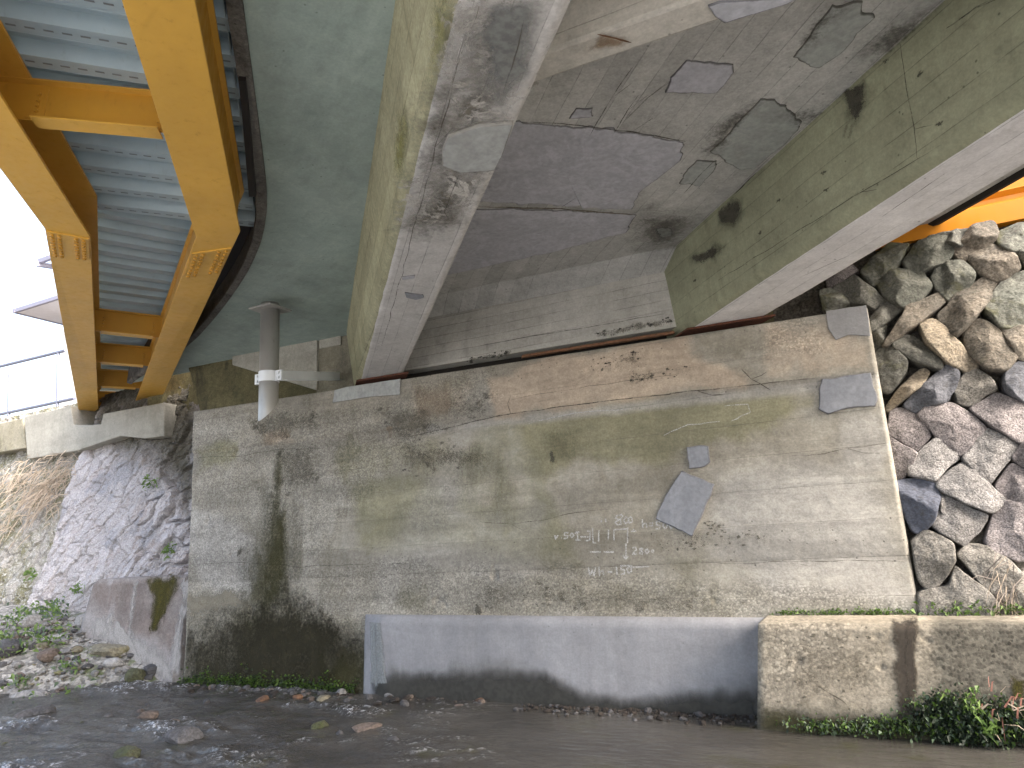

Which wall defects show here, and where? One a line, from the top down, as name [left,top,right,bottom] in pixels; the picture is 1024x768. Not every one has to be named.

crack [495,201,630,215]
spalling [596,317,672,337]
water stain [92,462,758,716]
water stain [892,617,918,725]